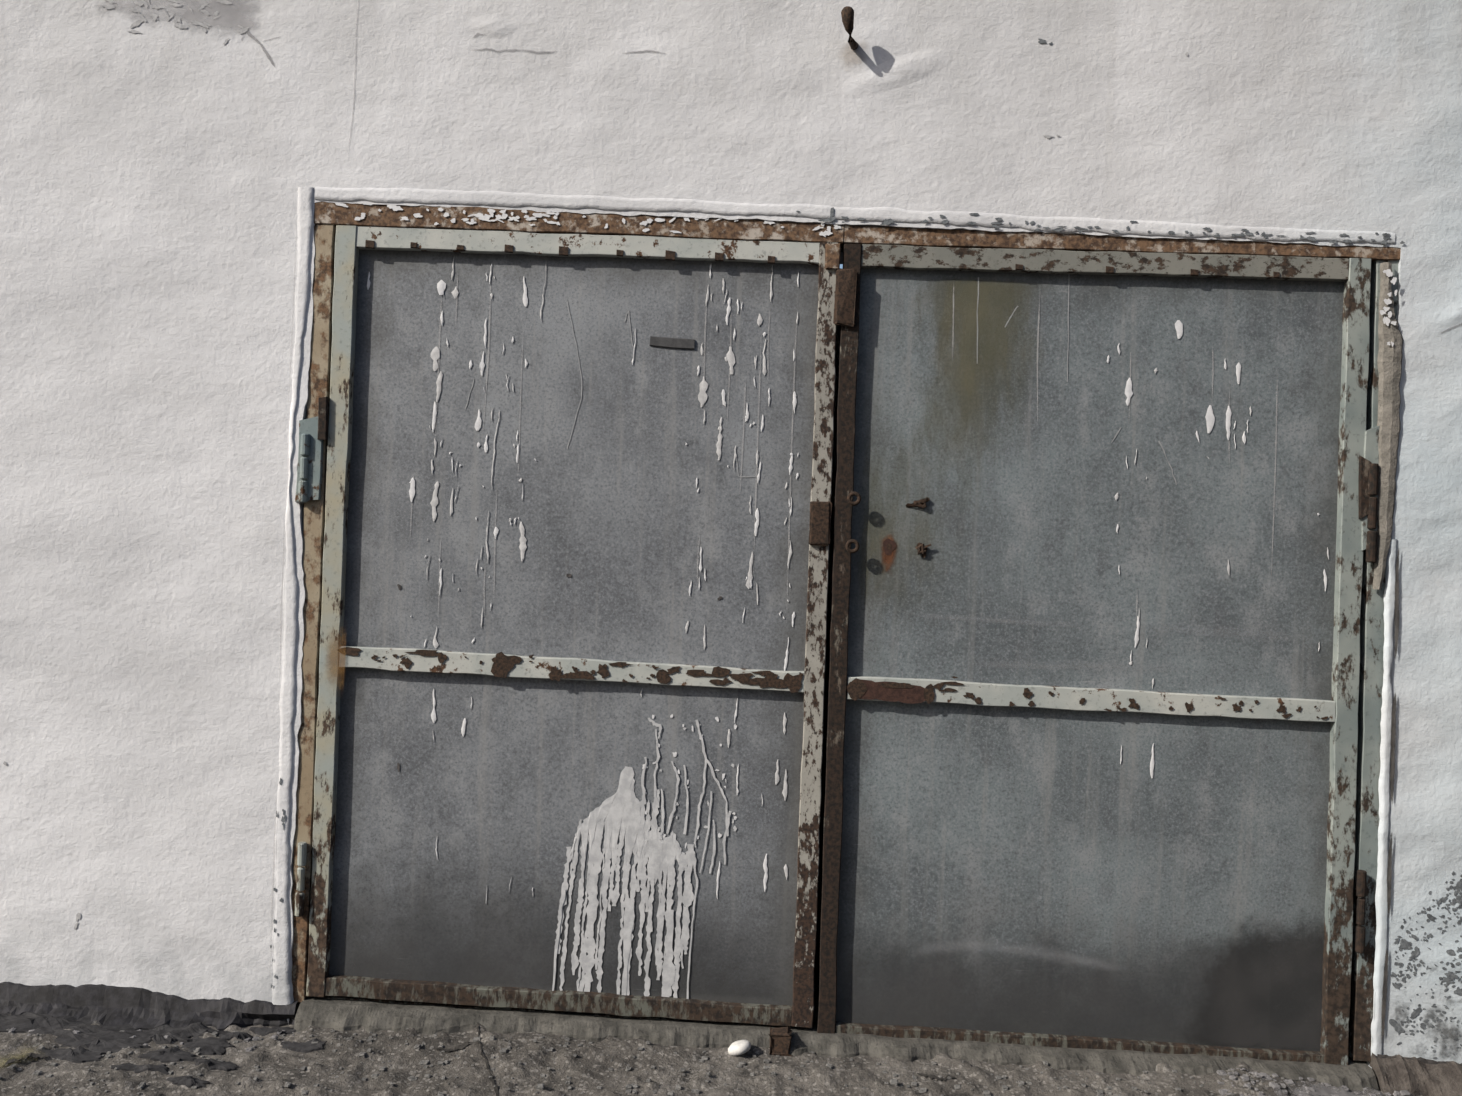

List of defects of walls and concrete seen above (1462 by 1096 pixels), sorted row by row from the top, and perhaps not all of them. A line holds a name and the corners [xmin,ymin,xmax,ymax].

peeling [101,0,254,45]
peeling [604,217,738,233]
peeling [813,207,895,237]
corrosion [882,536,896,570]
corrosion [338,647,534,678]
corrosion [549,662,804,693]
corrosion [847,676,982,704]
corrosion [1009,688,1054,707]
corrosion [1103,698,1139,712]
corrosion [1219,697,1259,712]
corrosion [1276,705,1328,720]
leakage [1425,1011,1459,1055]